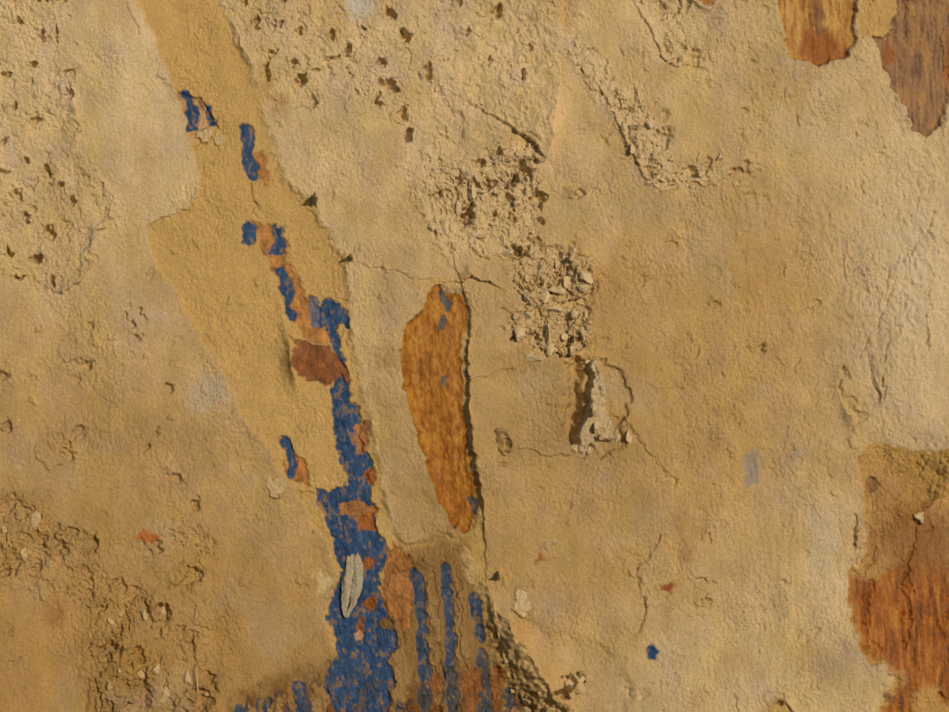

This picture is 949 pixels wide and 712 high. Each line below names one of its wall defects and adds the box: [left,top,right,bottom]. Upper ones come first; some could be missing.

peeling [0,0,122,293]
crack [124,2,141,37]
peeling [136,0,633,712]
peeling [0,479,221,712]